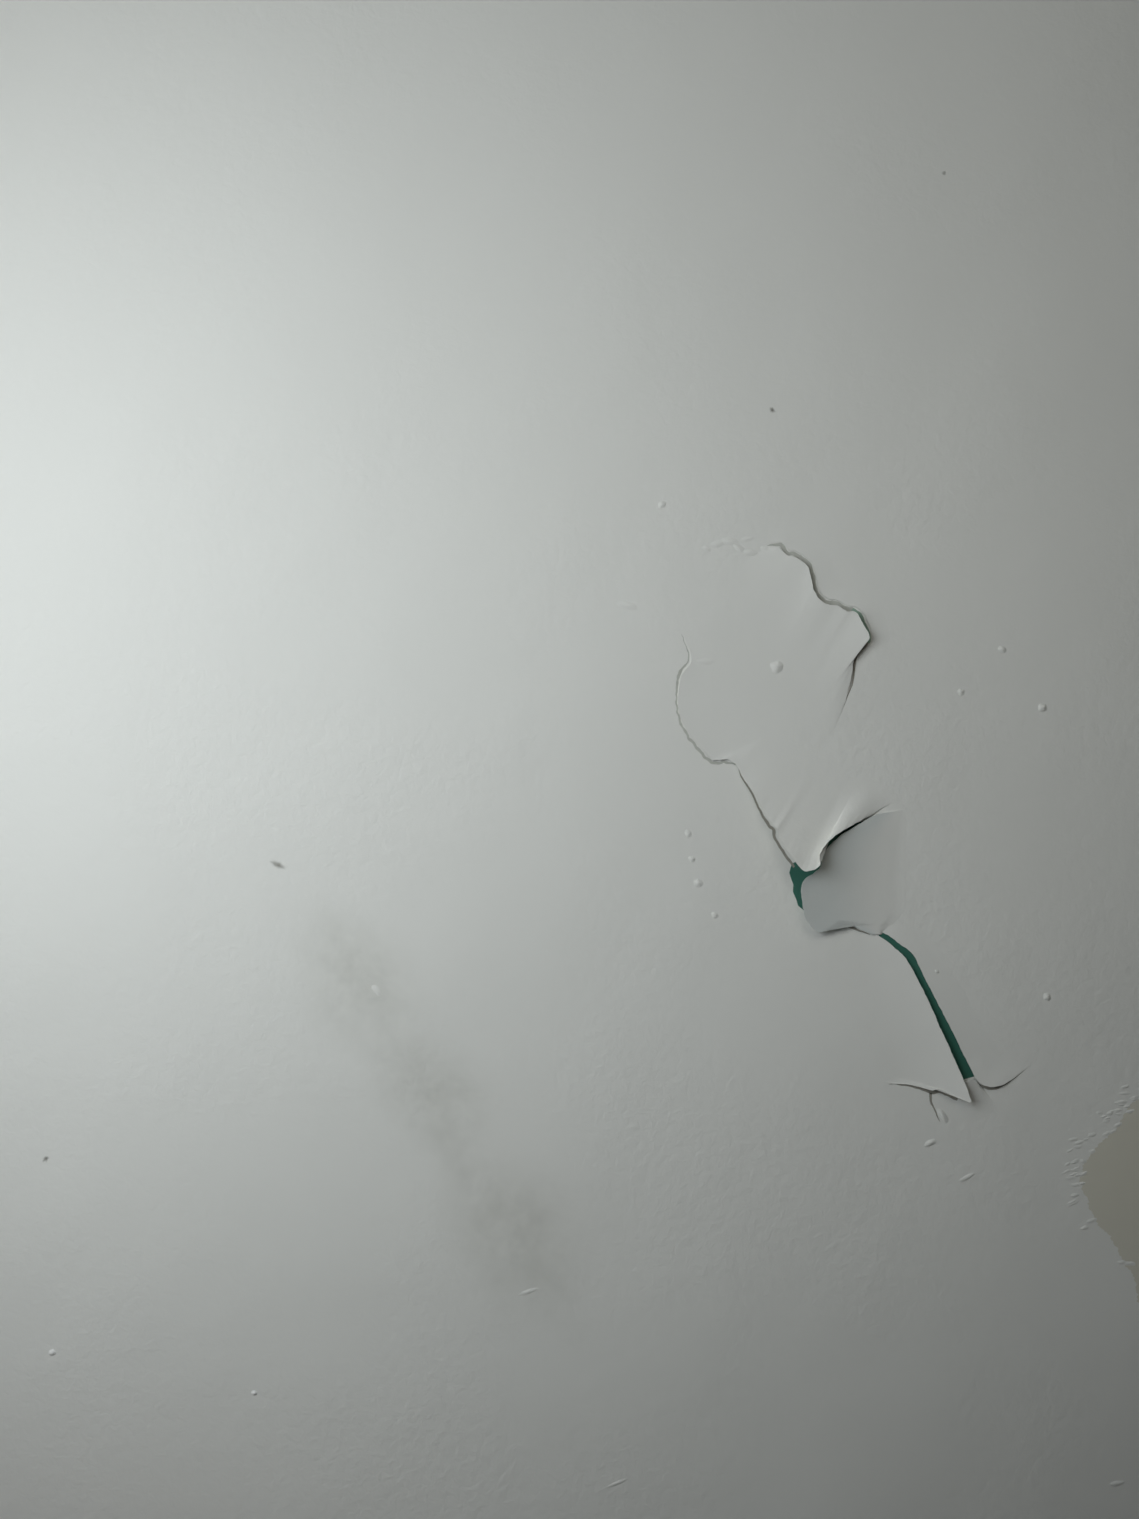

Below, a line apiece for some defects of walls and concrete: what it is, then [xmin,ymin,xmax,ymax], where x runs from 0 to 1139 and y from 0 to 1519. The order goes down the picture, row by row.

peeling [736,733,1031,1121]